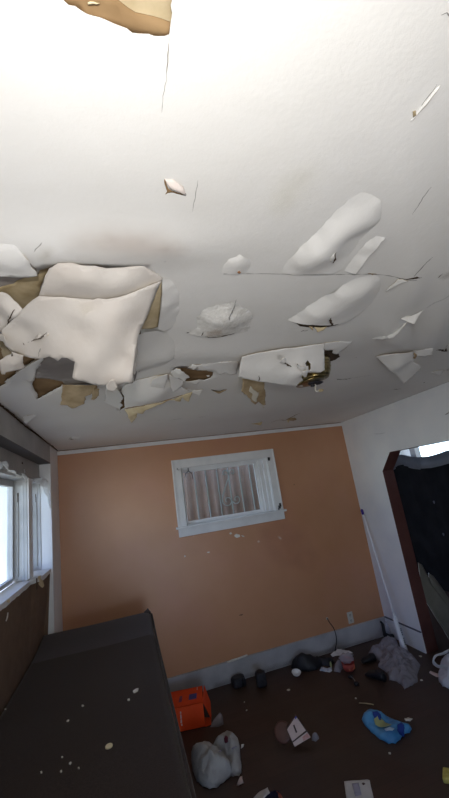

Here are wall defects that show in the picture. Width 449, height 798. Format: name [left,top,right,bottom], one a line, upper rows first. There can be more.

peeling [165,179,186,195]
peeling [324,341,351,361]
peeling [188,361,239,375]